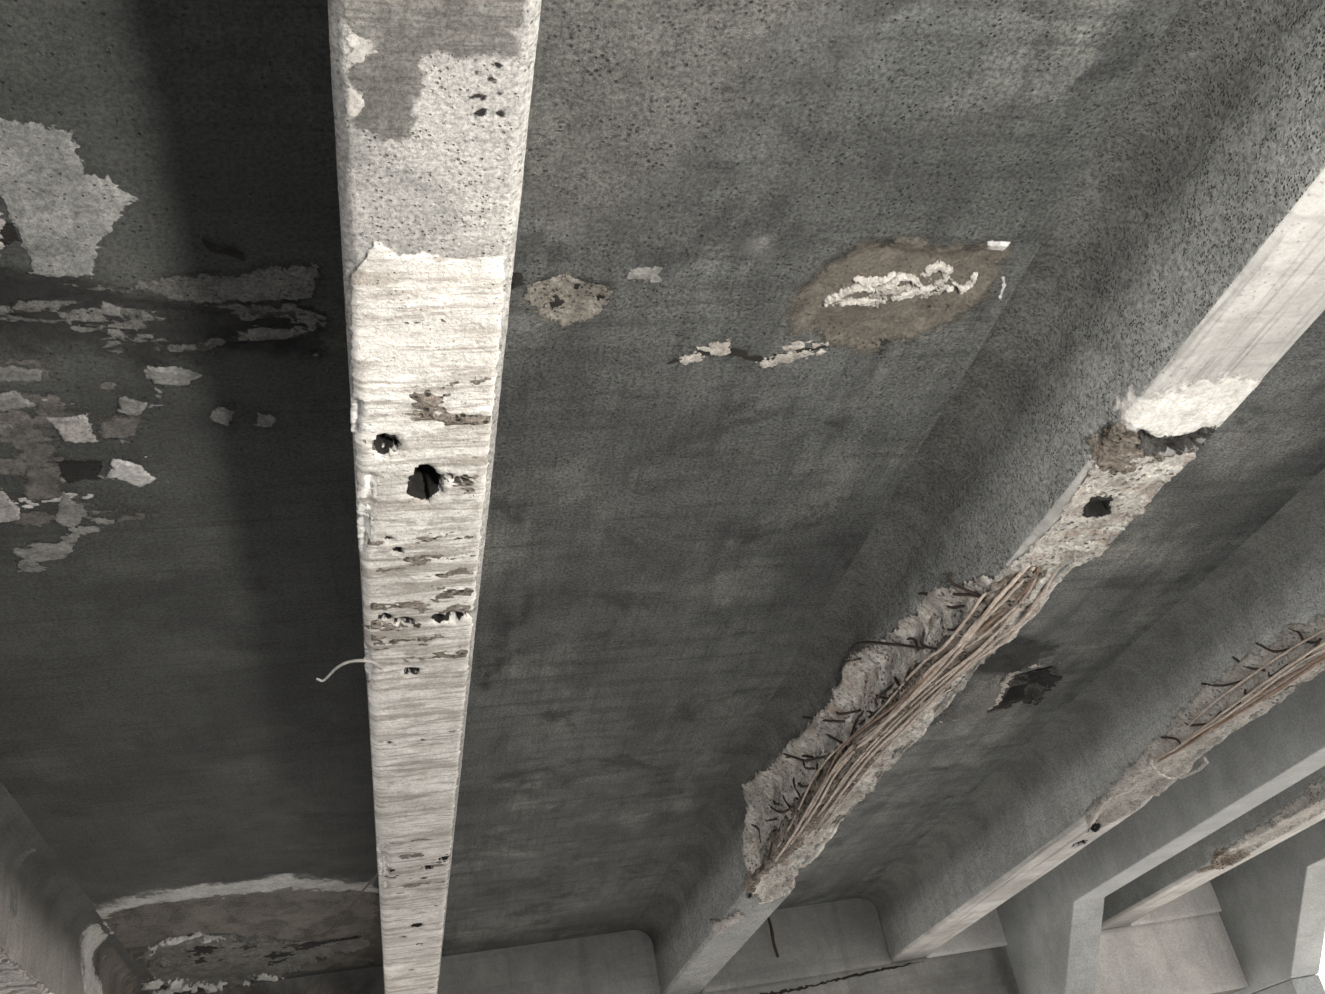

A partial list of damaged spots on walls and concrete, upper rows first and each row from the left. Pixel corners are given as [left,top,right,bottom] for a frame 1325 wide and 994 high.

peeling [0,118,328,572]
peeling [627,266,663,283]
spalling [785,236,1011,355]
spalling [133,241,613,994]
rust [743,568,1048,893]
spalling [742,372,1264,957]
spalling [1072,614,1325,847]
spalling [1197,780,1325,873]
spalling [0,948,54,994]
crack [760,961,922,994]